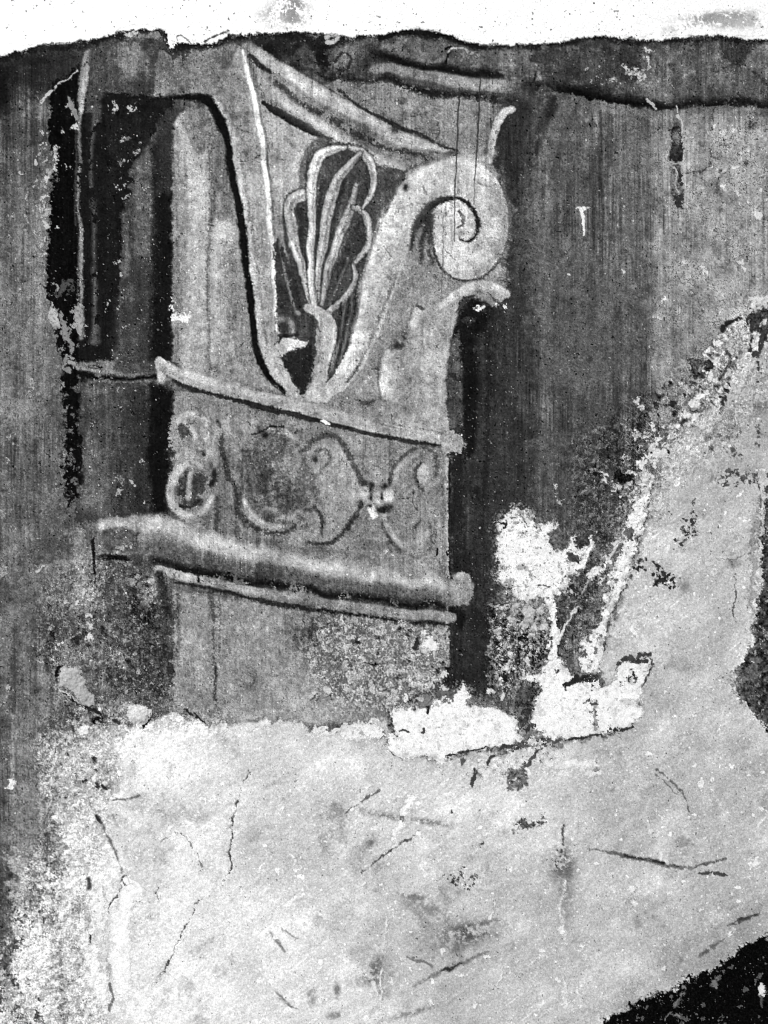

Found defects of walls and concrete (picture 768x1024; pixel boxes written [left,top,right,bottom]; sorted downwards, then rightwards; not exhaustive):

peeling [167,32,178,48]
peeling [325,33,340,45]
peeling [61,97,81,133]
spalling [720,184,768,220]
peeling [7,130,88,434]
flaking render [39,290,768,1024]
crack [227,770,249,874]
crack [141,900,199,989]